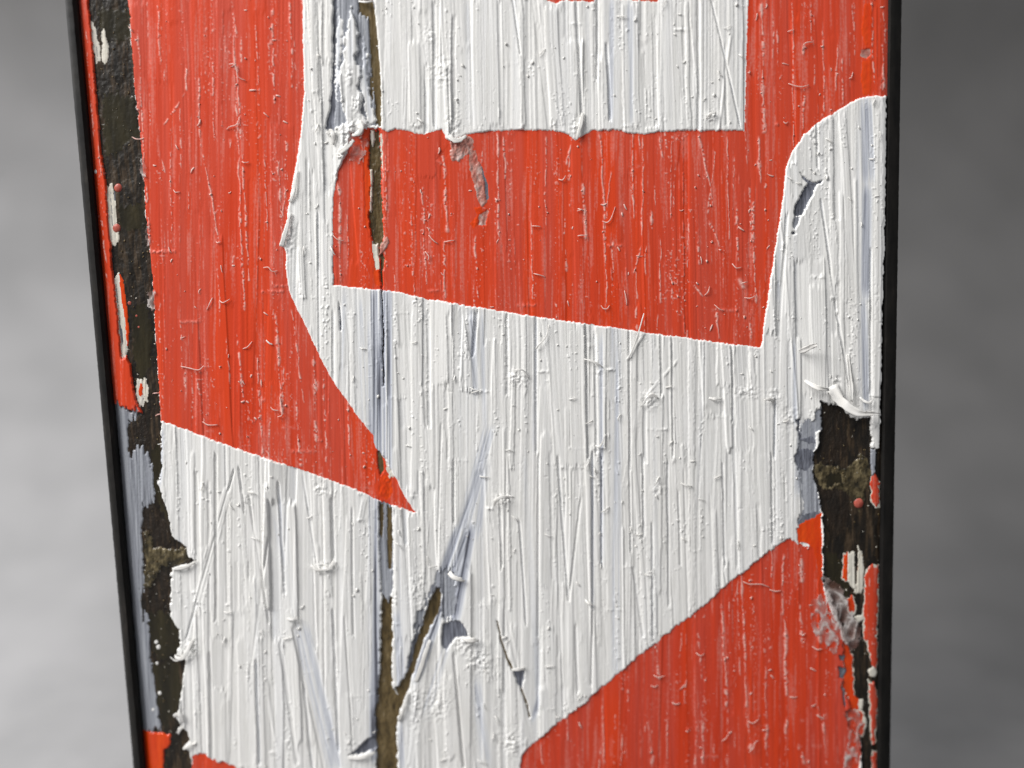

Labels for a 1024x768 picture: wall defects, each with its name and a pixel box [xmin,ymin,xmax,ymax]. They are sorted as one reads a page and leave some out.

peeling [479,210,489,226]
spalling [792,174,822,234]
peeling [89,0,196,768]
peeling [794,354,881,768]
spalling [350,736,378,754]